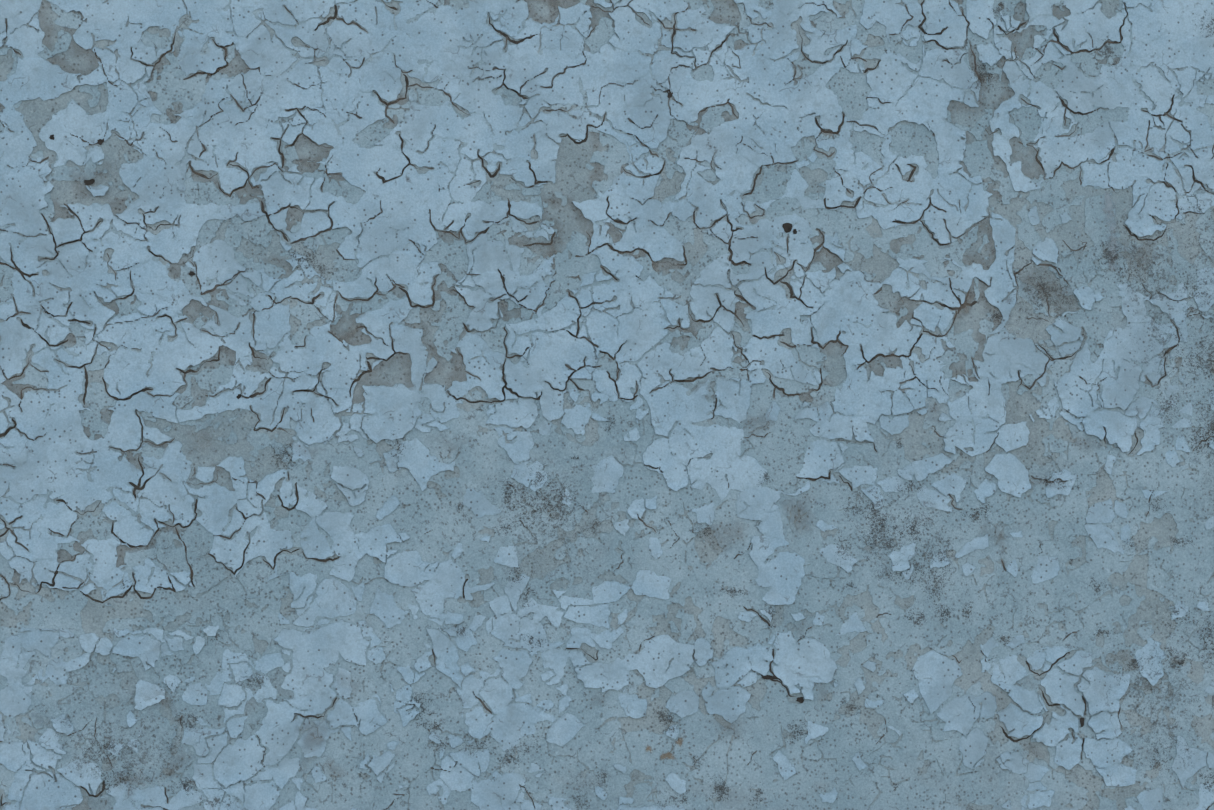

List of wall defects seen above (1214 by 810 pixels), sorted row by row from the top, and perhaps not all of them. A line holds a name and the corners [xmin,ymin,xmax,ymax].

crack [0,0,1214,603]
peeling [1194,267,1214,319]
peeling [1029,282,1193,456]
peeling [1046,469,1077,498]
peeling [1084,498,1133,554]
peeling [0,625,219,810]
peeling [101,484,713,810]
peeling [701,631,838,723]
peeling [805,720,829,744]
peeling [904,635,1165,810]
crack [1000,630,1086,760]
peeling [1171,735,1214,810]